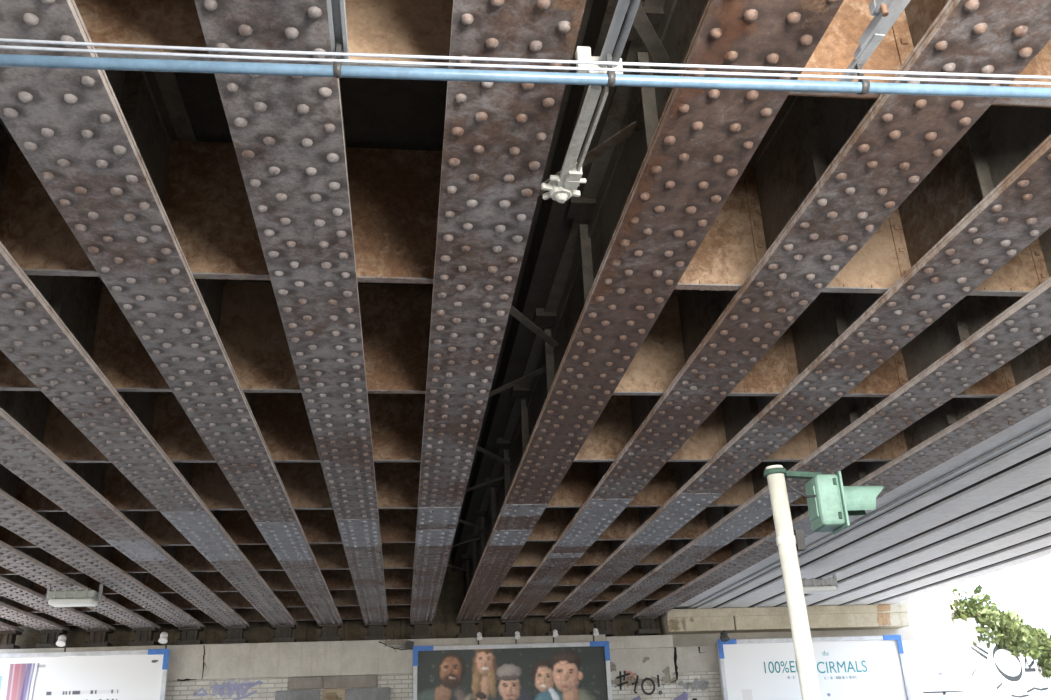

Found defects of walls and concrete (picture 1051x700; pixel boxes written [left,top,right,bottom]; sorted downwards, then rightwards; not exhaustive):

crack [177,645,207,681]
crack [670,647,704,683]